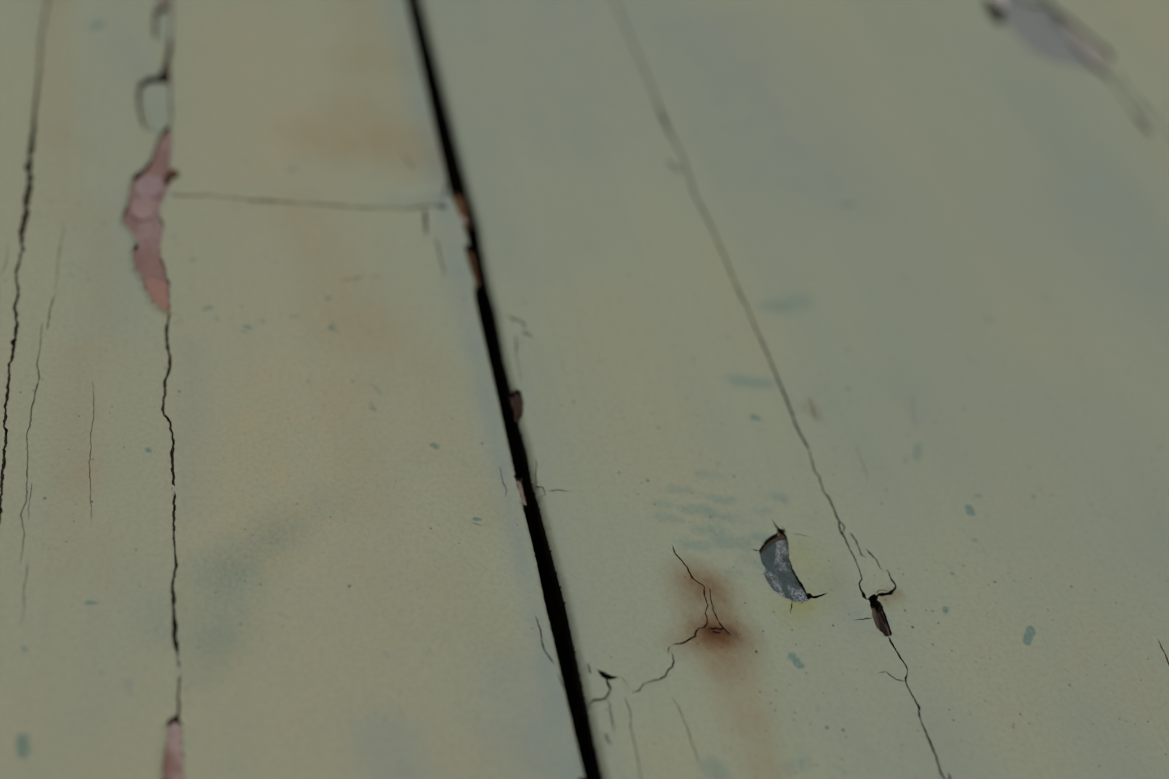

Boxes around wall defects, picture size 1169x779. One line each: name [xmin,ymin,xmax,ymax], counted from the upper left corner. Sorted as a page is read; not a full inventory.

peeling [154,38,172,84]
peeling [985,0,1112,79]
peeling [123,125,179,317]
crack [171,194,448,277]
crack [0,0,65,625]
crack [88,383,96,522]
crack [161,313,181,722]
crack [614,0,951,779]
peeling [753,520,827,613]
crack [536,618,563,687]
crack [589,547,731,779]
peeling [162,715,184,779]